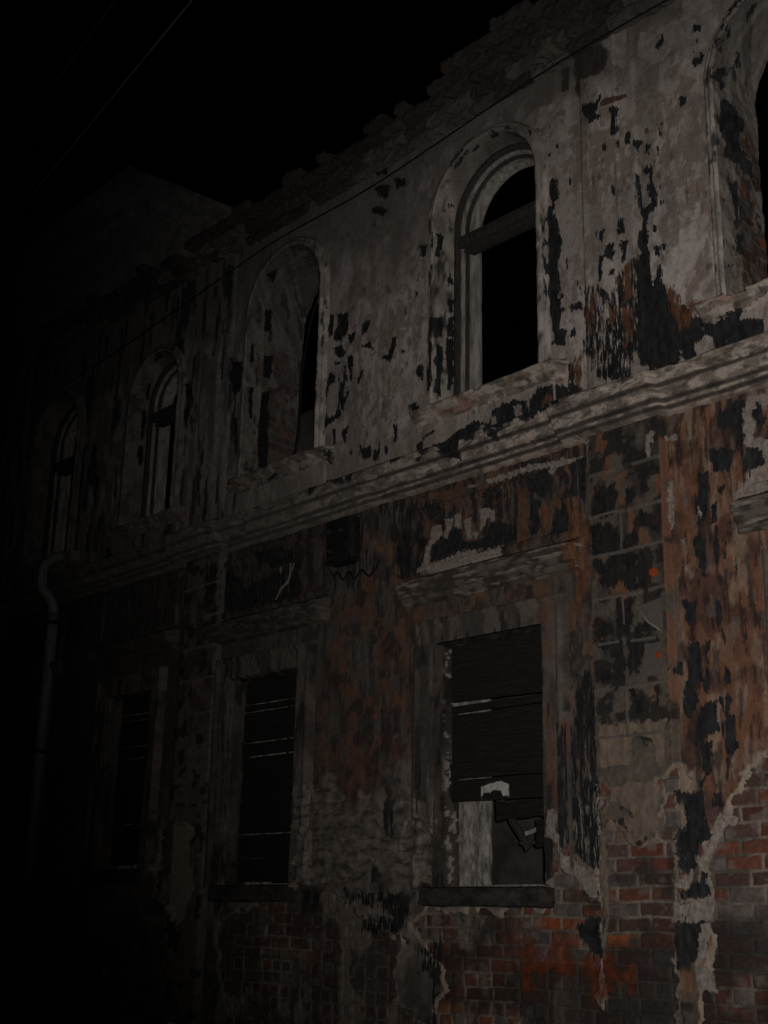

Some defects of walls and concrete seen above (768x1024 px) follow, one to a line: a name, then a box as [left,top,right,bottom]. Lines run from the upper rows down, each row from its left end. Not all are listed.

peeling [416,230,456,398]
peeling [541,178,583,347]
peeling [581,94,764,369]
corrosion [667,284,695,332]
peeling [319,312,581,466]
peeling [416,507,504,574]
peeling [468,455,583,488]
peeling [645,430,678,458]
peeling [665,481,675,530]
peeling [733,392,768,501]
spalling [413,718,768,1024]